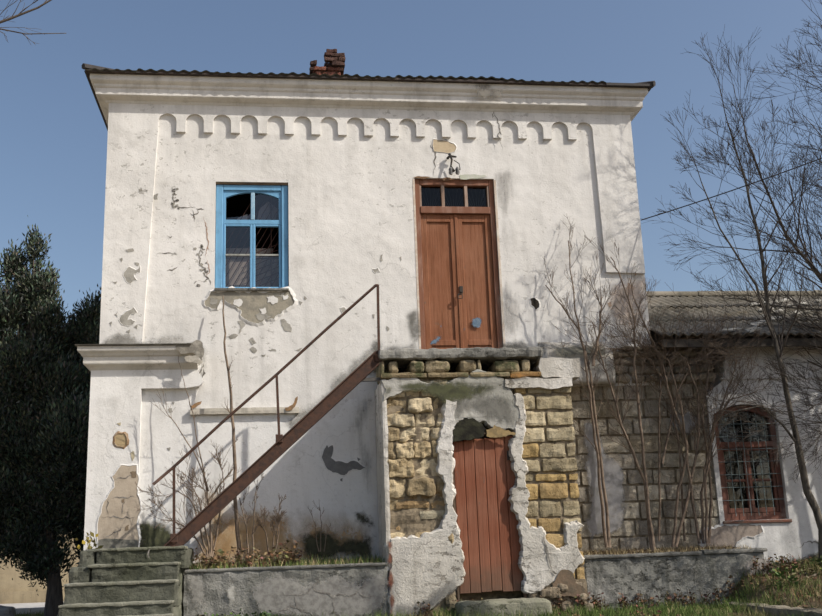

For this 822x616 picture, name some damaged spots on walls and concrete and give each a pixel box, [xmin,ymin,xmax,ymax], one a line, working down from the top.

peeling [432,139,457,154]
crack [163,186,211,287]
peeling [112,248,141,284]
peeling [109,307,138,333]
peeling [201,286,307,339]
spalling [95,422,143,549]
peeling [321,444,367,481]
spalling [387,379,447,519]
spalling [453,346,765,598]